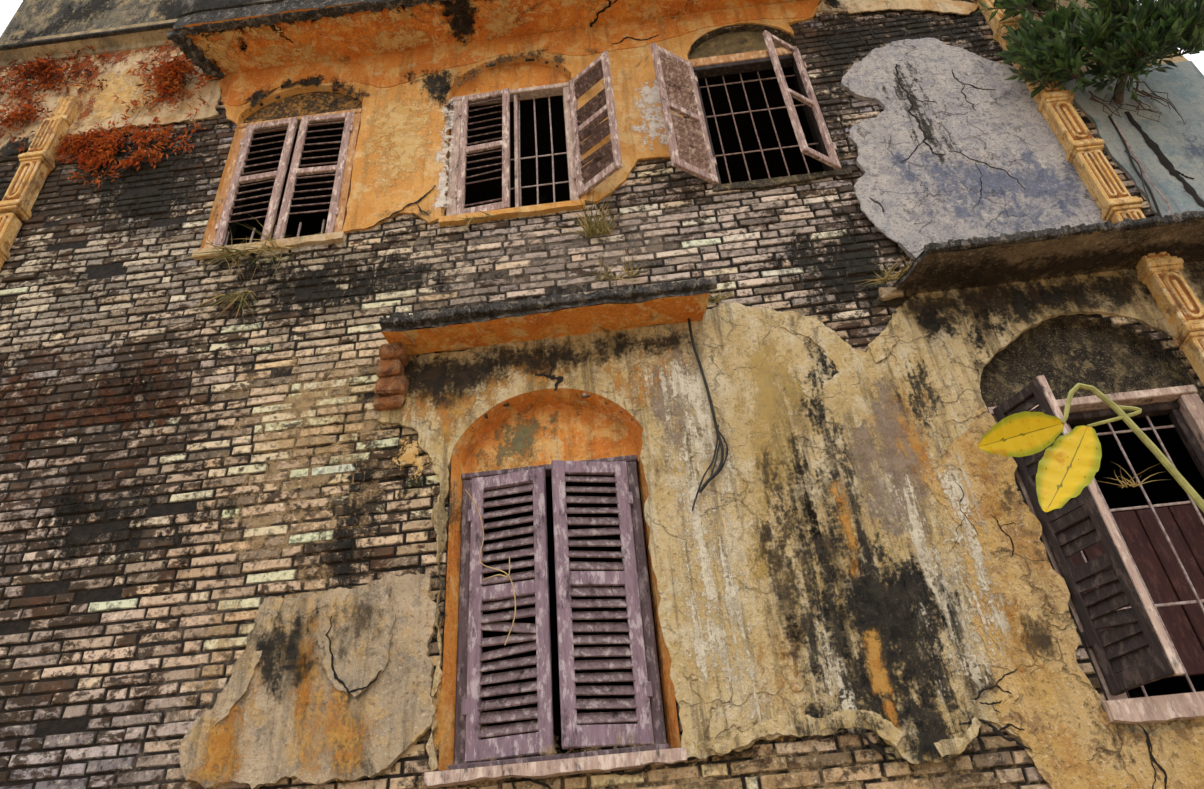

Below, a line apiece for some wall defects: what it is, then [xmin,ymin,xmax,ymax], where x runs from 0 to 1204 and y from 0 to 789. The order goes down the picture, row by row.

water stain [193,18,327,70]
water stain [432,0,492,44]
crack [590,0,657,44]
peeling [66,70,191,135]
peeling [801,0,1105,260]
crack [895,64,1025,207]
crack [1124,111,1204,208]
peeling [779,312,856,377]
water stain [256,454,392,700]
water stain [404,332,1009,770]
crack [325,616,382,694]
peeling [681,709,981,764]